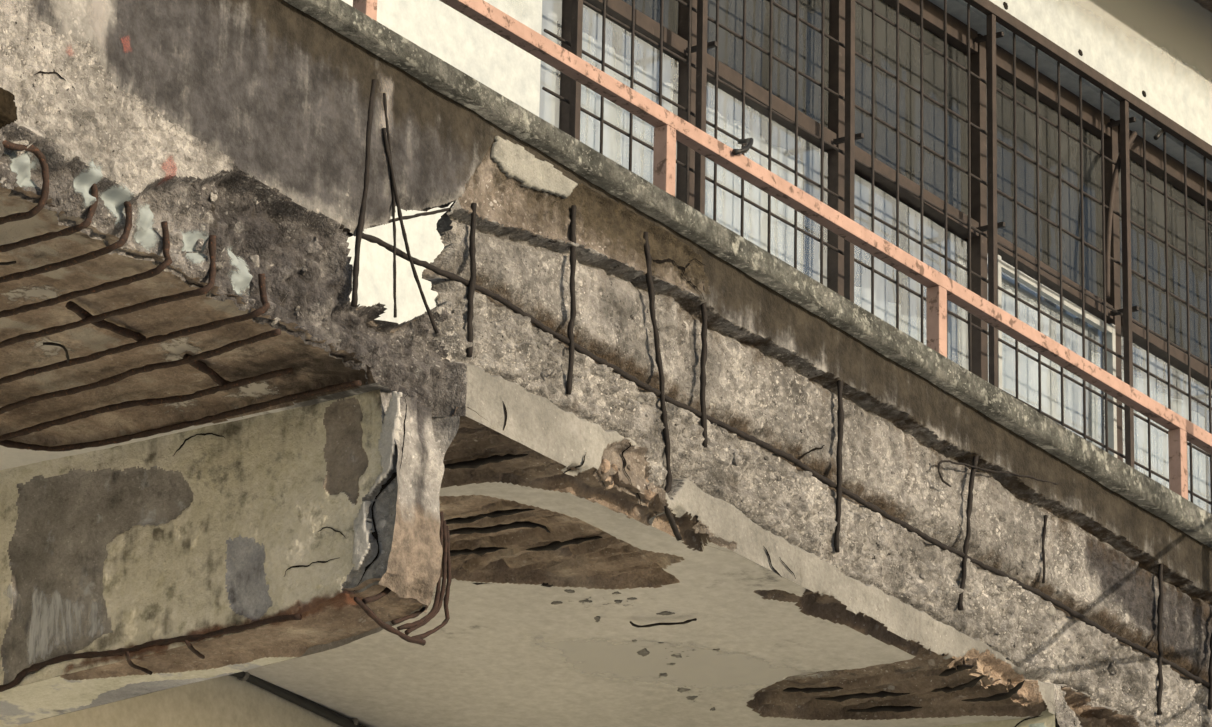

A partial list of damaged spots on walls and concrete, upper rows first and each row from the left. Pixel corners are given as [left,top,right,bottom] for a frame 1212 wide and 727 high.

peeling [78,672,234,710]
corrosion [66,592,364,672]
spalling [0,79,467,496]
peeling [0,394,685,692]
spalling [382,93,1212,727]